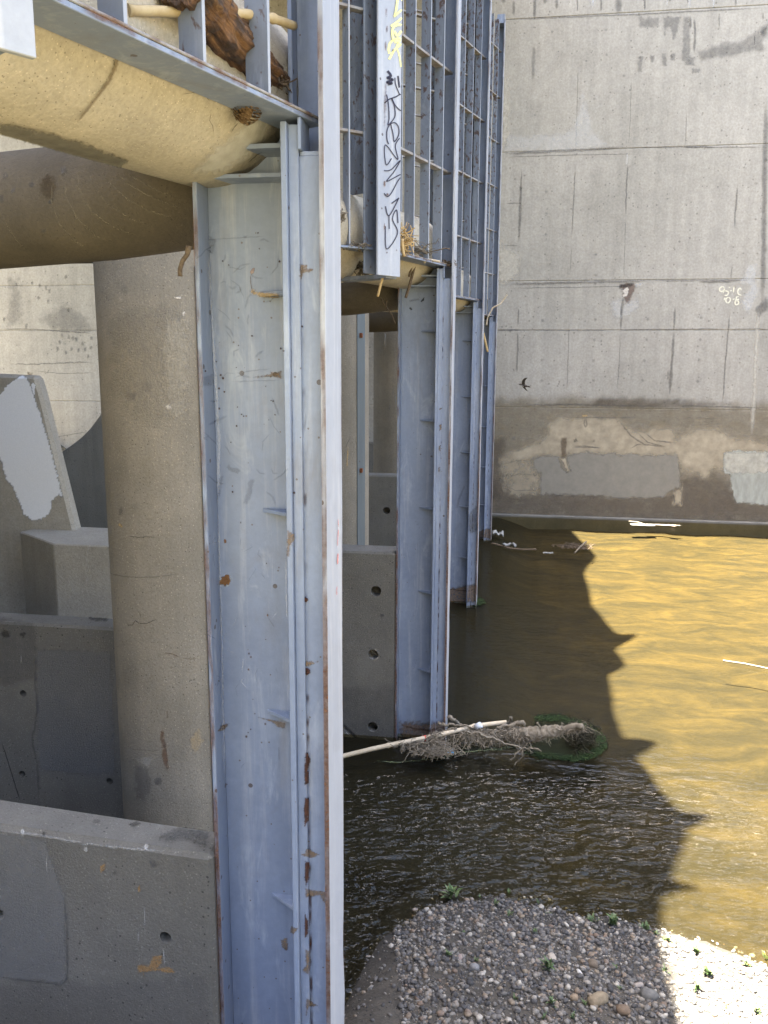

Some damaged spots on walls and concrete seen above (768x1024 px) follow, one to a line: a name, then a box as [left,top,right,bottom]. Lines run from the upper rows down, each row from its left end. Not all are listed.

damp [492,320,768,522]
peeling [725,453,768,473]
corrosion [395,416,494,745]